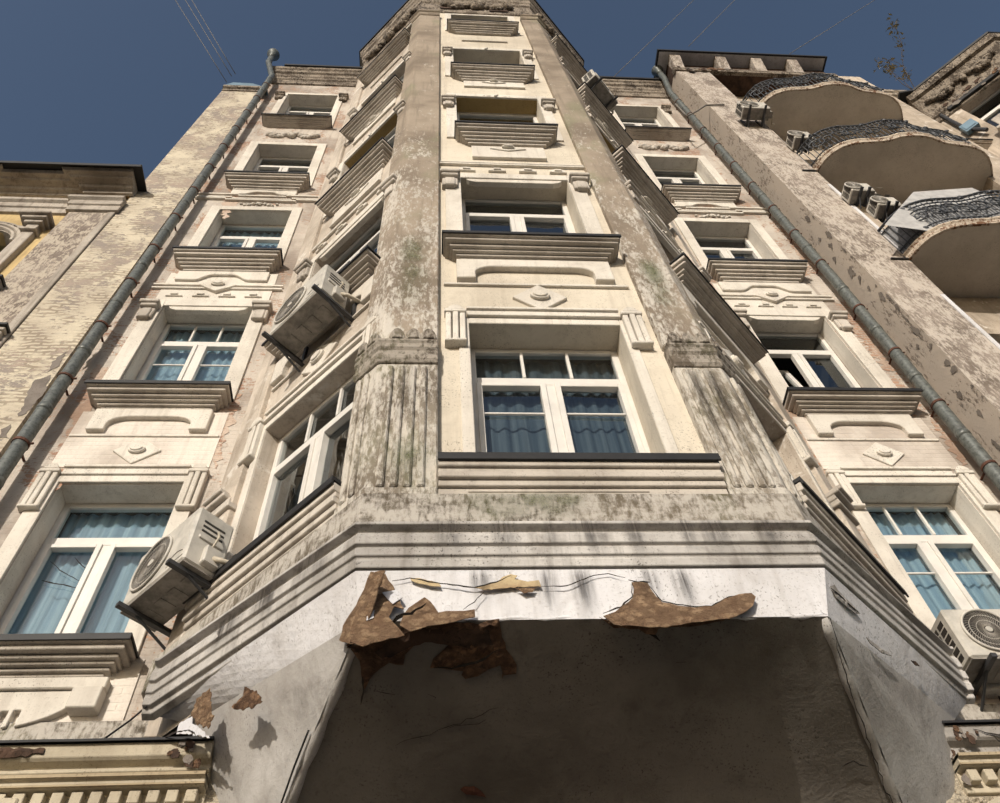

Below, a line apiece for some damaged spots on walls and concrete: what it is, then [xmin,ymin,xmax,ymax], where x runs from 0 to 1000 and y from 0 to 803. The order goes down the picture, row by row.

flaking render [848,314,896,371]
flaking render [847,266,932,349]
peeling [0,351,67,437]
flaking render [65,364,109,436]
flaking render [926,412,968,466]
damp [575,572,587,593]
spalling [339,570,756,703]
spalling [159,688,215,768]
spalling [232,687,263,711]